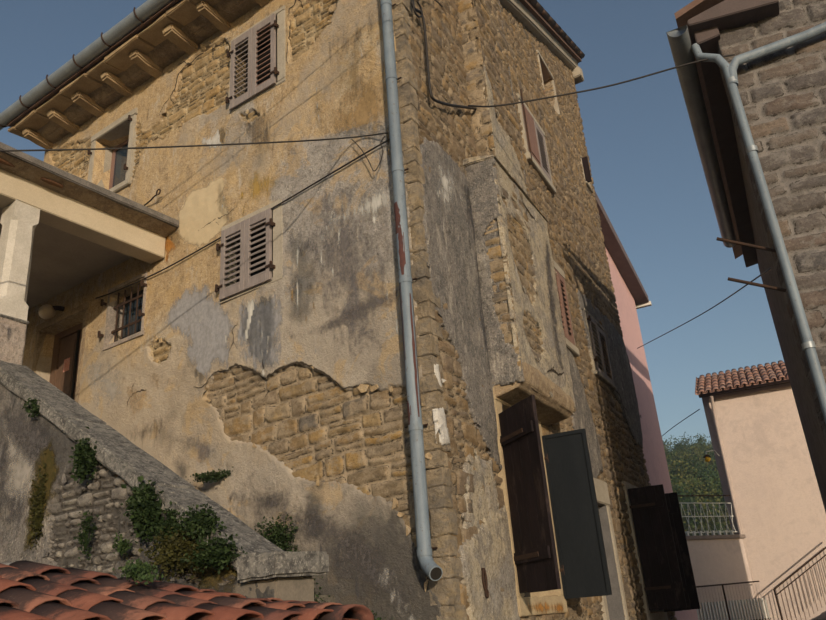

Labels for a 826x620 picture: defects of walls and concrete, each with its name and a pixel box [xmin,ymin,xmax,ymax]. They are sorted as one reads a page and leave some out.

spalling [290,0,338,62]
spalling [130,40,231,181]
spalling [150,338,171,364]
water stain [245,299,254,341]
spalling [167,285,417,547]
water stain [316,189,392,339]